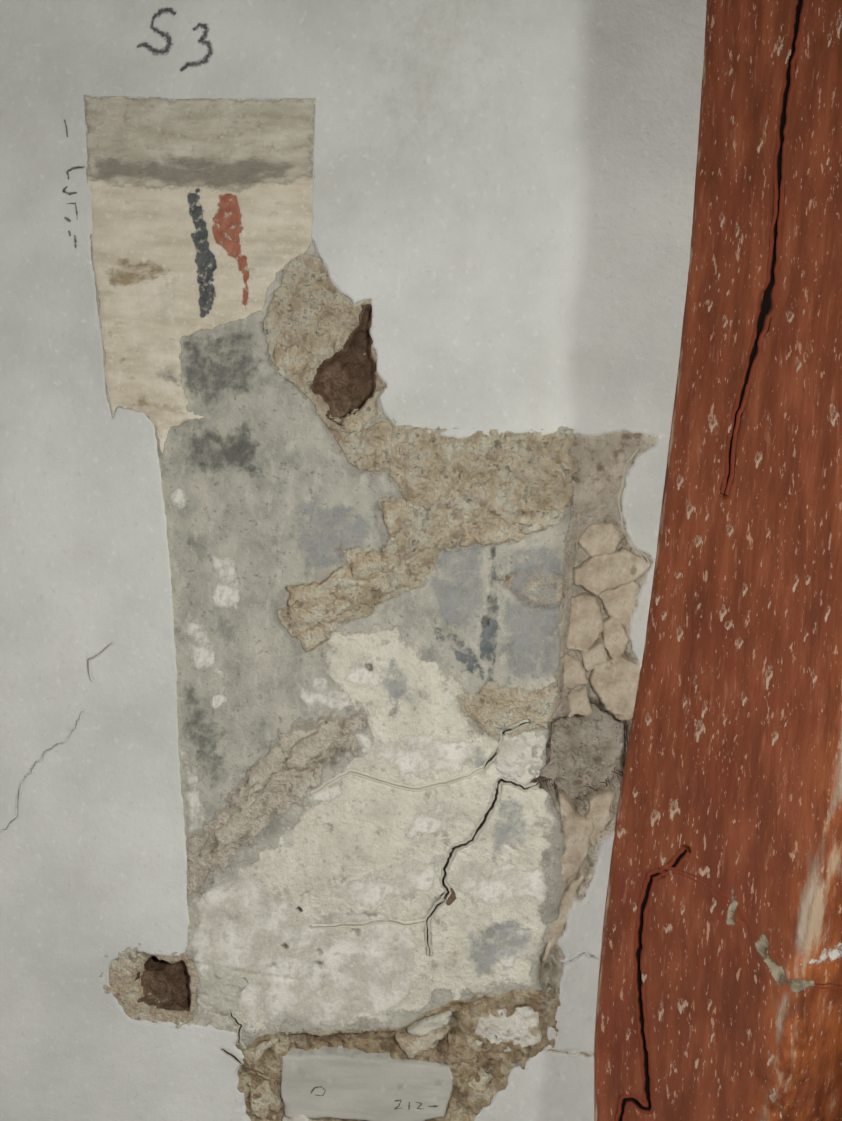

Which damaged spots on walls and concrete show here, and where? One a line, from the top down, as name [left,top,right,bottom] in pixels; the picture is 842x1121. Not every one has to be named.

crack [720,0,806,495]
peeling [83,95,659,1121]
peeling [719,605,744,649]
crack [86,642,112,682]
peeling [683,675,708,742]
crack [0,711,83,834]
crack [310,720,540,955]
peeling [650,799,680,827]
crack [560,950,601,966]
peeling [658,998,688,1021]
crack [615,847,752,1121]